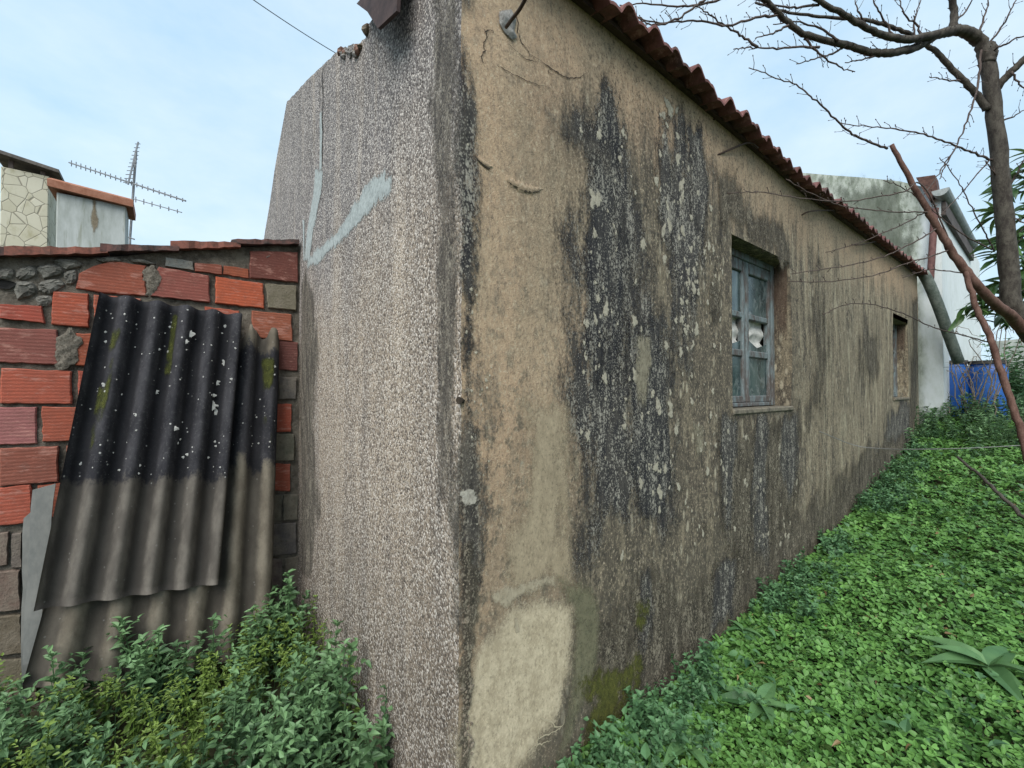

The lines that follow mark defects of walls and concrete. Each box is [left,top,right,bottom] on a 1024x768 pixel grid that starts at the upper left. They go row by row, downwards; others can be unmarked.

crack [481,29,583,88]
damp [428,0,497,635]
flaking render [455,398,599,768]
damp [545,73,790,599]
damp [593,250,918,723]